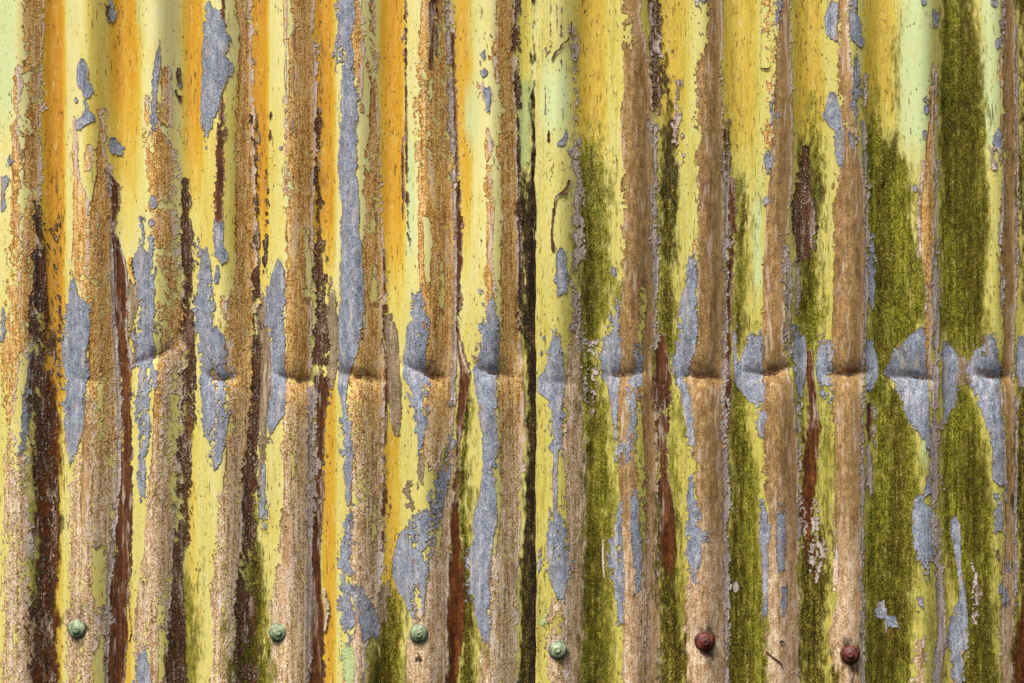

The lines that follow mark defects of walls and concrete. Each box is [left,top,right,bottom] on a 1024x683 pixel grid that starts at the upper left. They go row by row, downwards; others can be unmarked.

rust [31,368,62,683]
rust [103,167,135,683]
peeling [0,0,528,683]
rust [428,0,469,683]
peeling [537,310,587,683]
water stain [567,23,599,417]
rust [652,333,676,583]
rust [798,350,821,560]
peeling [670,0,1024,683]